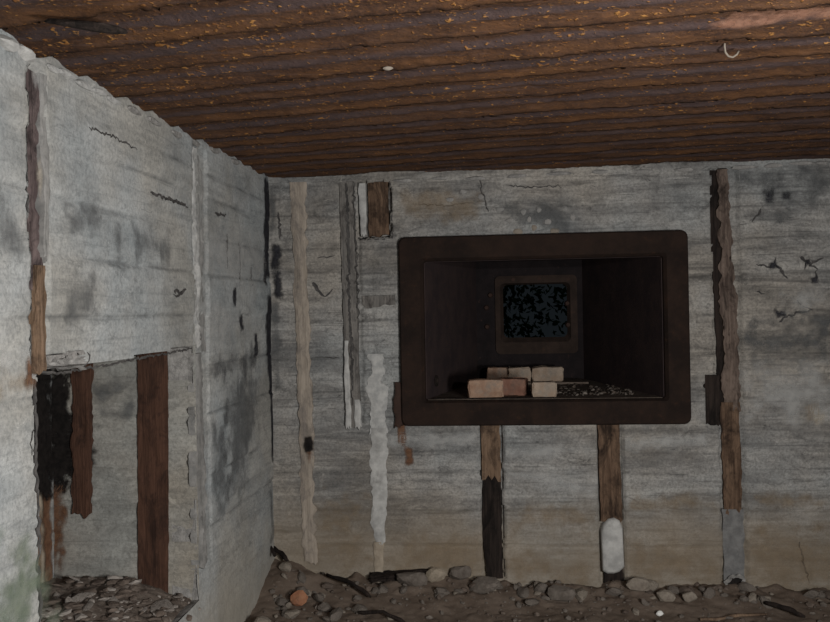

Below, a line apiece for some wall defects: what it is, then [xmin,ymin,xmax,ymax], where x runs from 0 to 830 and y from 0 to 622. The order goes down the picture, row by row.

crack [89,127,137,149]
crack [150,191,188,208]
crack [756,256,824,283]
crack [775,300,814,322]
leakage [214,178,283,483]